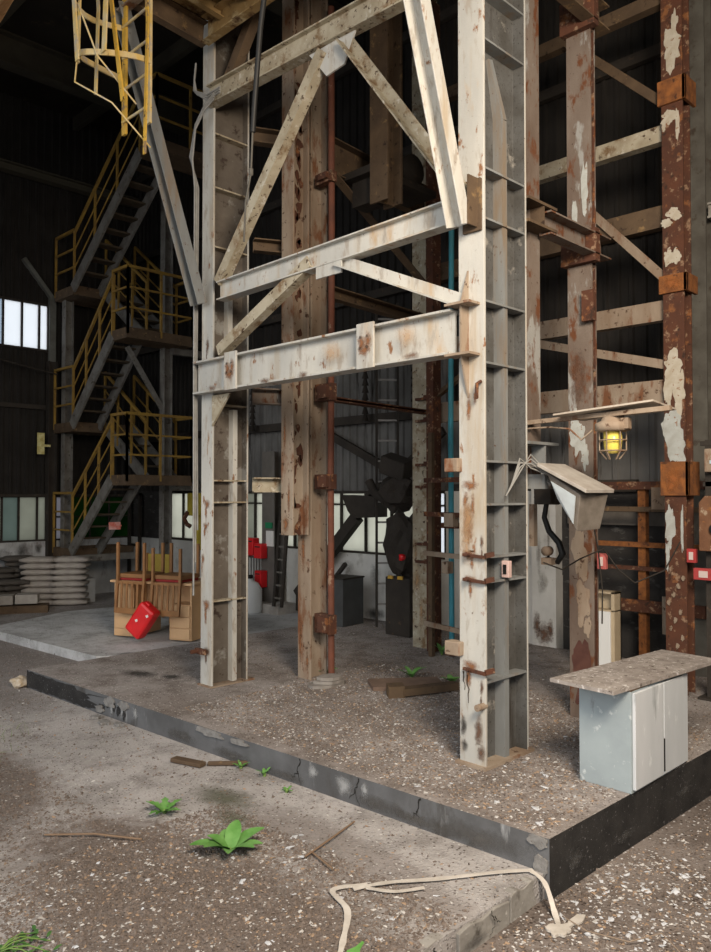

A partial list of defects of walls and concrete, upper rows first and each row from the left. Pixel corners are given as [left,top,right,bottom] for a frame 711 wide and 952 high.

peeling [661,207,682,228]
peeling [664,247,682,267]
corrosion [358,335,370,355]
peeling [661,347,686,462]
corrosion [463,482,483,566]
corrosion [476,722,484,759]
peeling [0,700,513,952]
peeling [491,818,711,952]